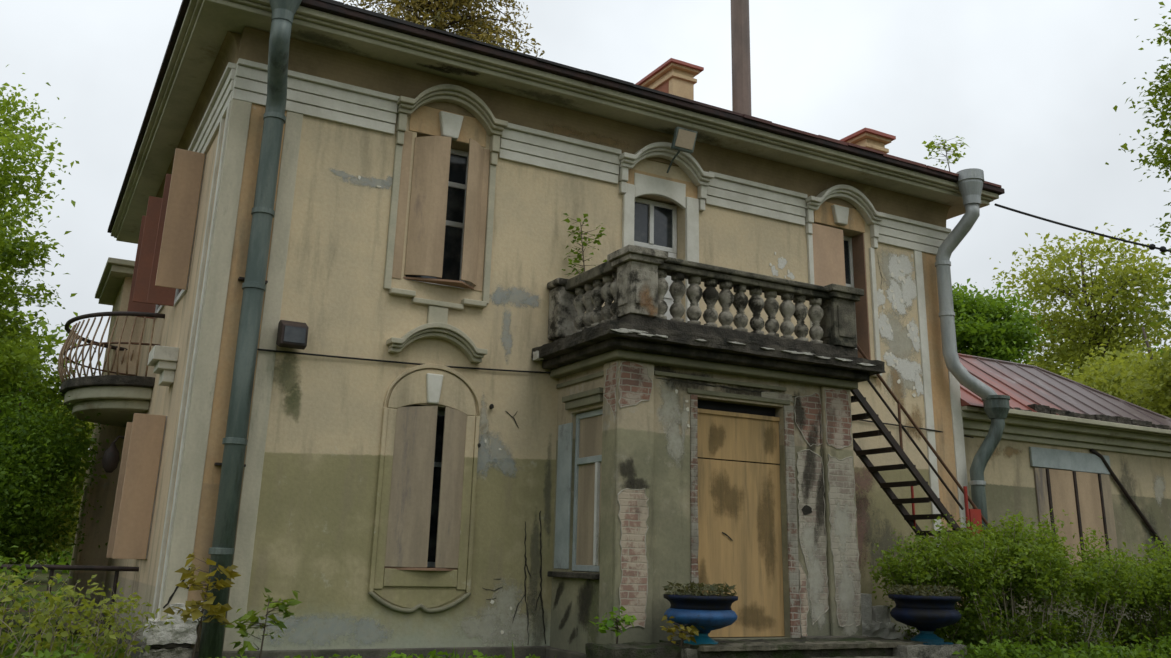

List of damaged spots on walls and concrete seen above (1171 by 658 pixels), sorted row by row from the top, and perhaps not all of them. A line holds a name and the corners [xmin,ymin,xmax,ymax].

damp [286,392,300,417]
spalling [611,328,668,338]
spalling [603,360,690,459]
peeling [761,252,924,397]
spalling [617,488,649,631]
spalling [761,392,861,636]